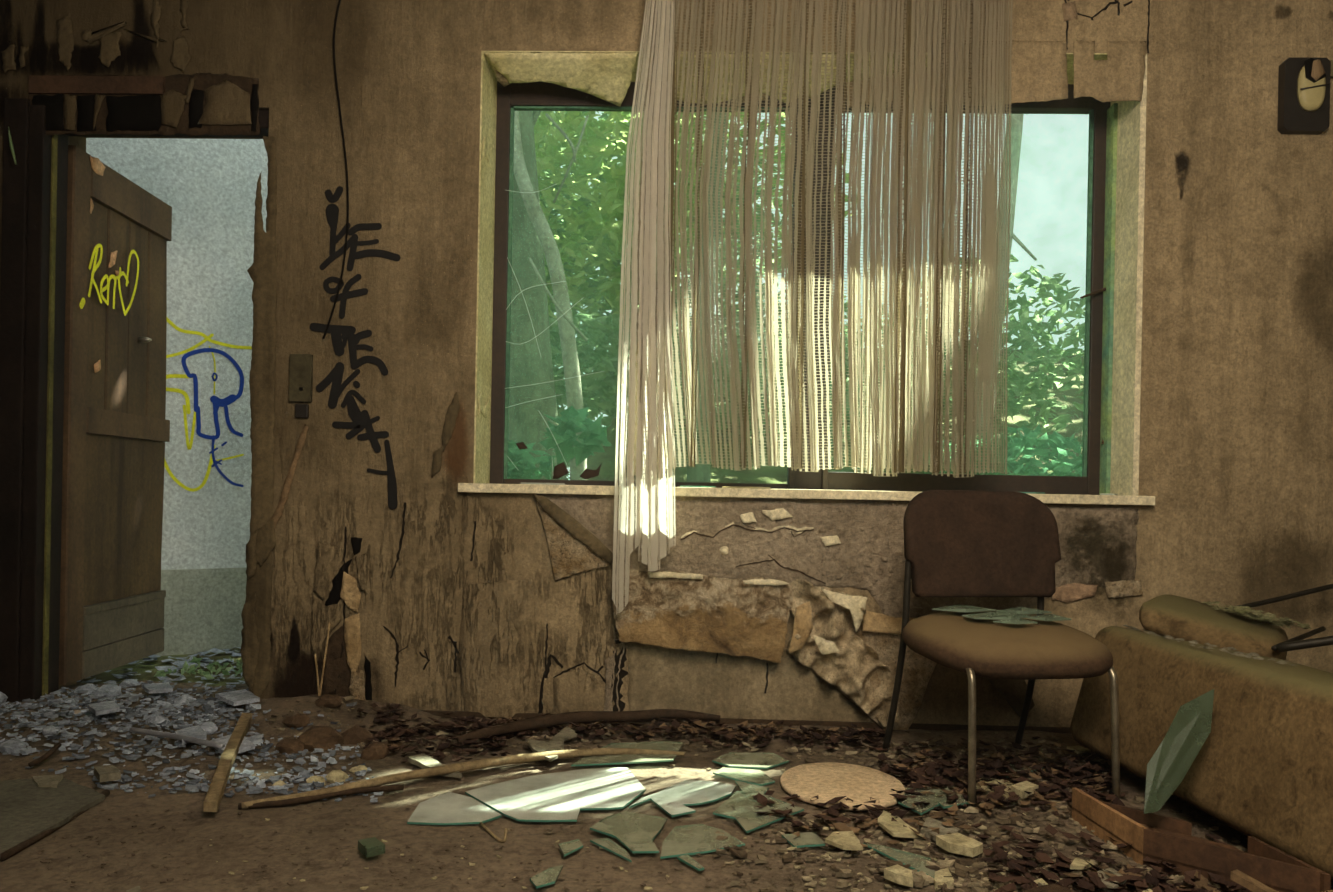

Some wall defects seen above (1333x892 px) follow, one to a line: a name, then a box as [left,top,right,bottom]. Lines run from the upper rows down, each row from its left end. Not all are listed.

peeling [0,0,252,130]
crack [1062,0,1150,53]
crack [681,522,826,584]
flaking render [545,496,1143,618]
leakage [1068,526,1130,605]
spalling [311,537,372,700]
peeling [628,642,872,722]